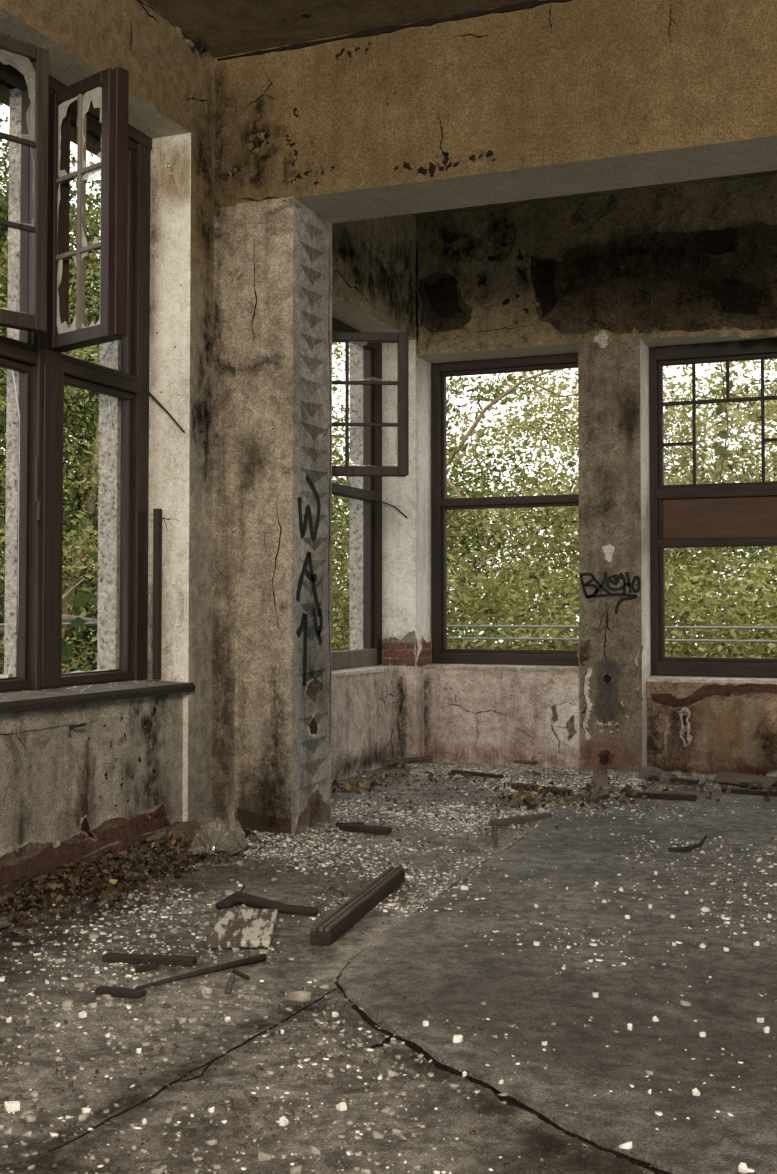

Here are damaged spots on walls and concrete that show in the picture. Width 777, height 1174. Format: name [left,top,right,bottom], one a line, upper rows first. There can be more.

crack [217,0,573,116]
damp [194,305,220,480]
peeling [0,704,172,888]
damp [213,637,291,832]
flaking render [381,629,432,671]
peeling [540,636,629,769]
peeling [632,645,777,747]
crack [415,824,535,913]
crack [48,950,672,1174]